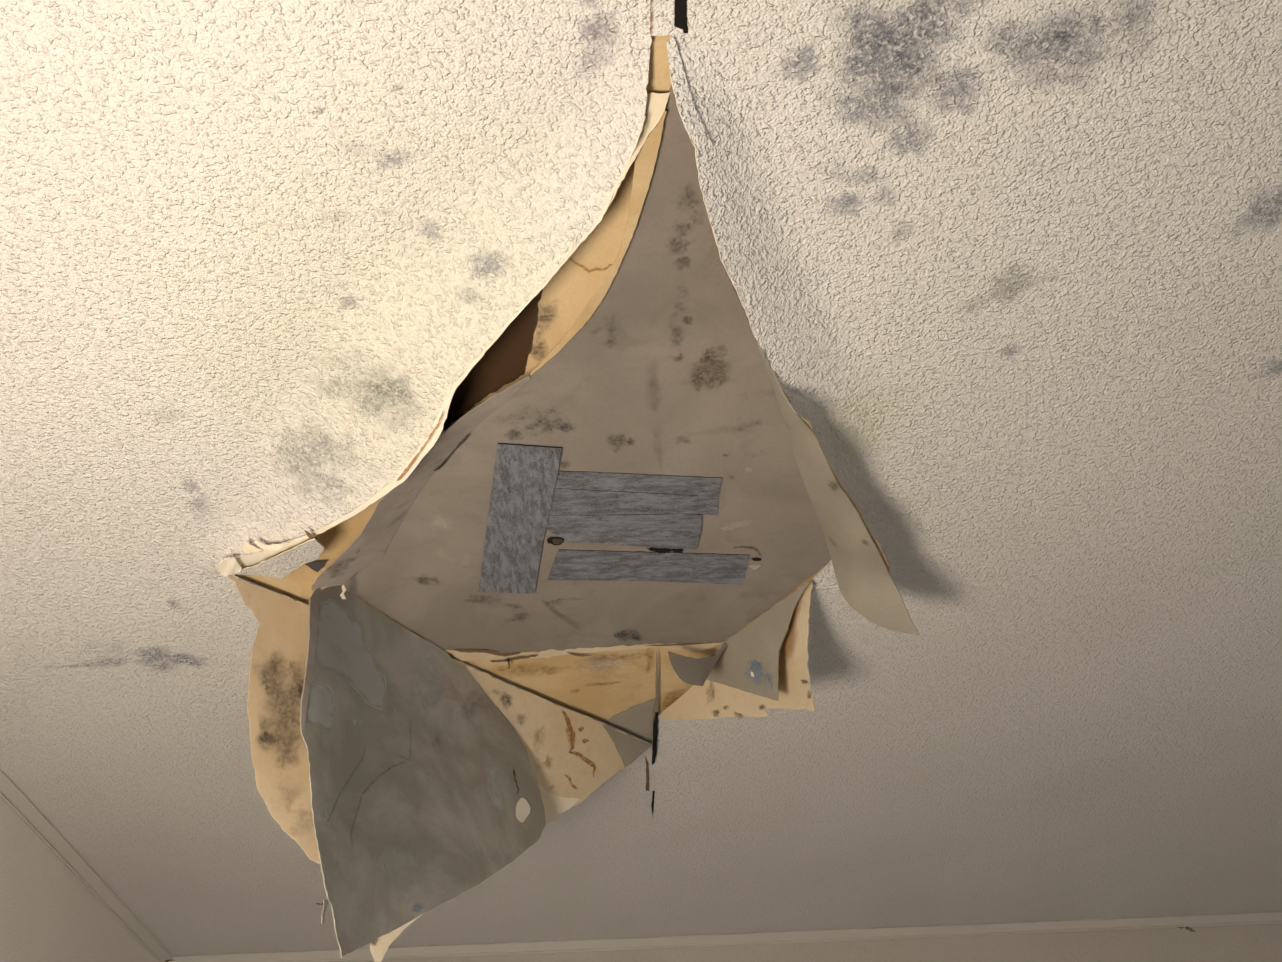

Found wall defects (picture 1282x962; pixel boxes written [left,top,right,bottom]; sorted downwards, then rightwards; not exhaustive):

crack [674,0,688,33]
water stain [853,53,922,118]
water stain [260,662,302,754]